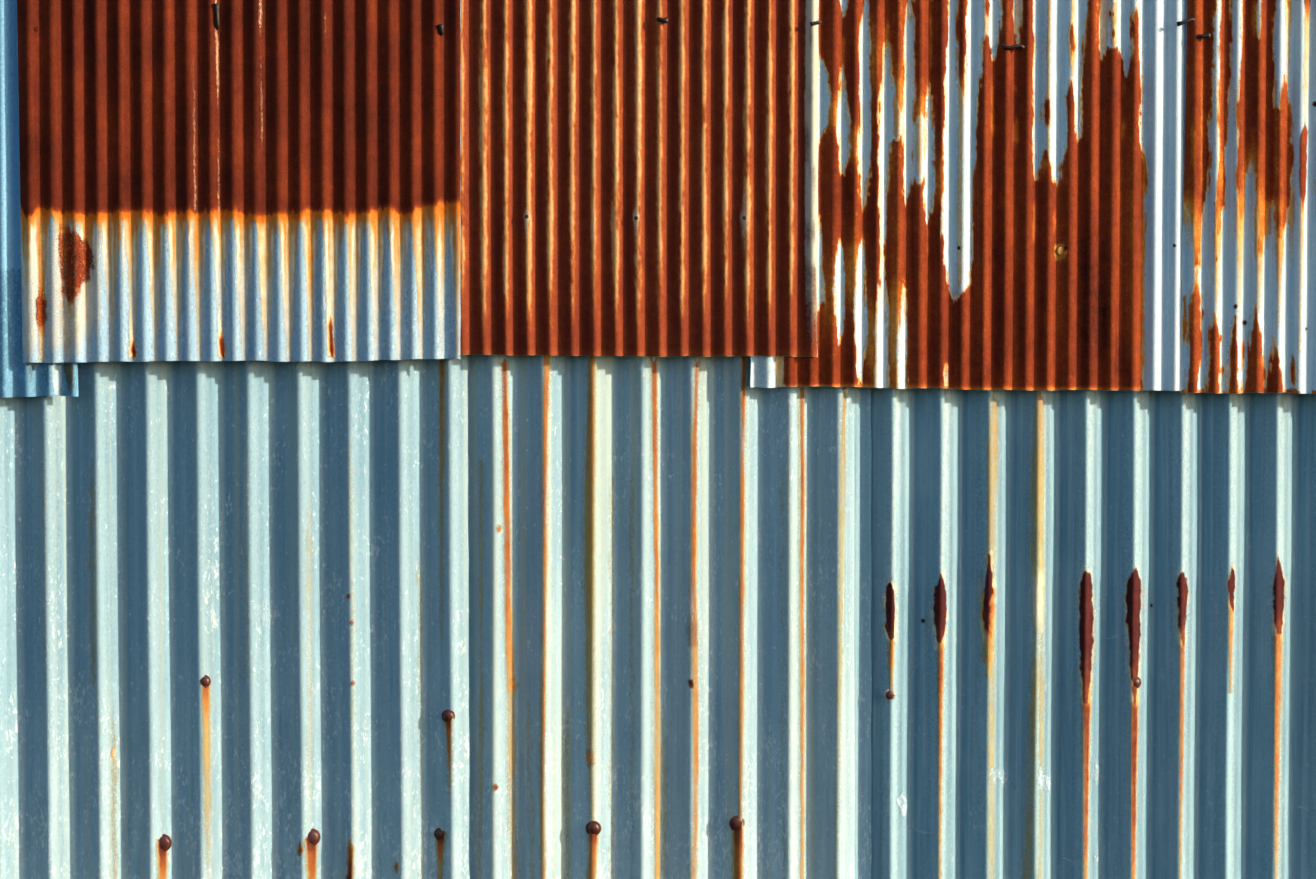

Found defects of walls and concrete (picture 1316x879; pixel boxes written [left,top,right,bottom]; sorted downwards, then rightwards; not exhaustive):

corrosion [17,0,461,360]
corrosion [1180,0,1316,394]
corrosion [438,359,446,589]
corrosion [460,0,1149,879]
corrosion [156,839,168,879]
corrosion [202,685,211,851]
corrosion [297,836,318,879]
corrosion [346,840,354,879]
corrosion [445,718,453,786]
corrosion [1174,571,1190,879]
corrosion [1226,566,1236,693]
corrosion [1271,556,1287,879]